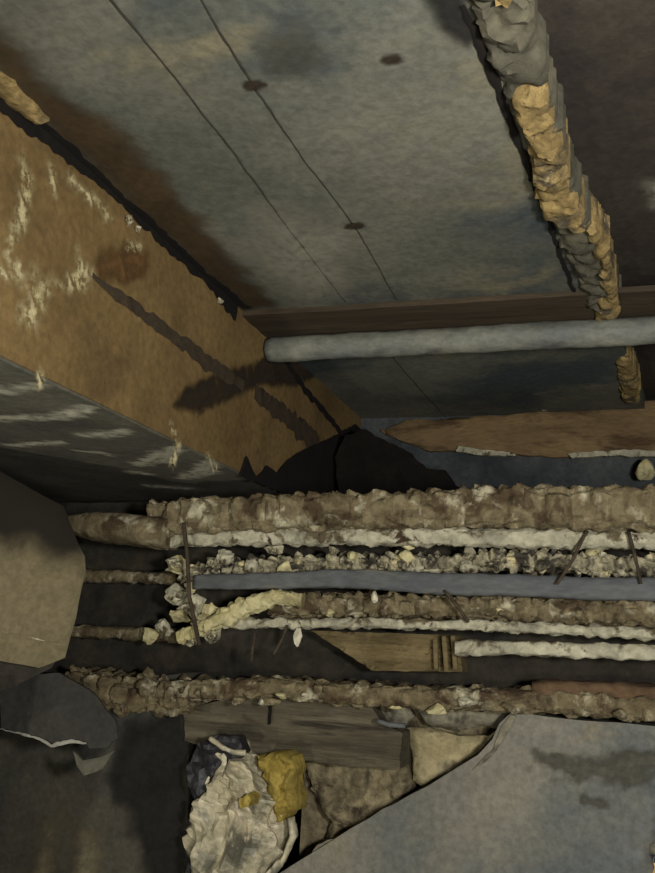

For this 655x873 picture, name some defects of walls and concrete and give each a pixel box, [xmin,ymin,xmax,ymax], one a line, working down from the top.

spalling [0,71,50,125]
leakage [21,283,50,325]
crack [0,98,252,321]
spalling [471,0,622,321]